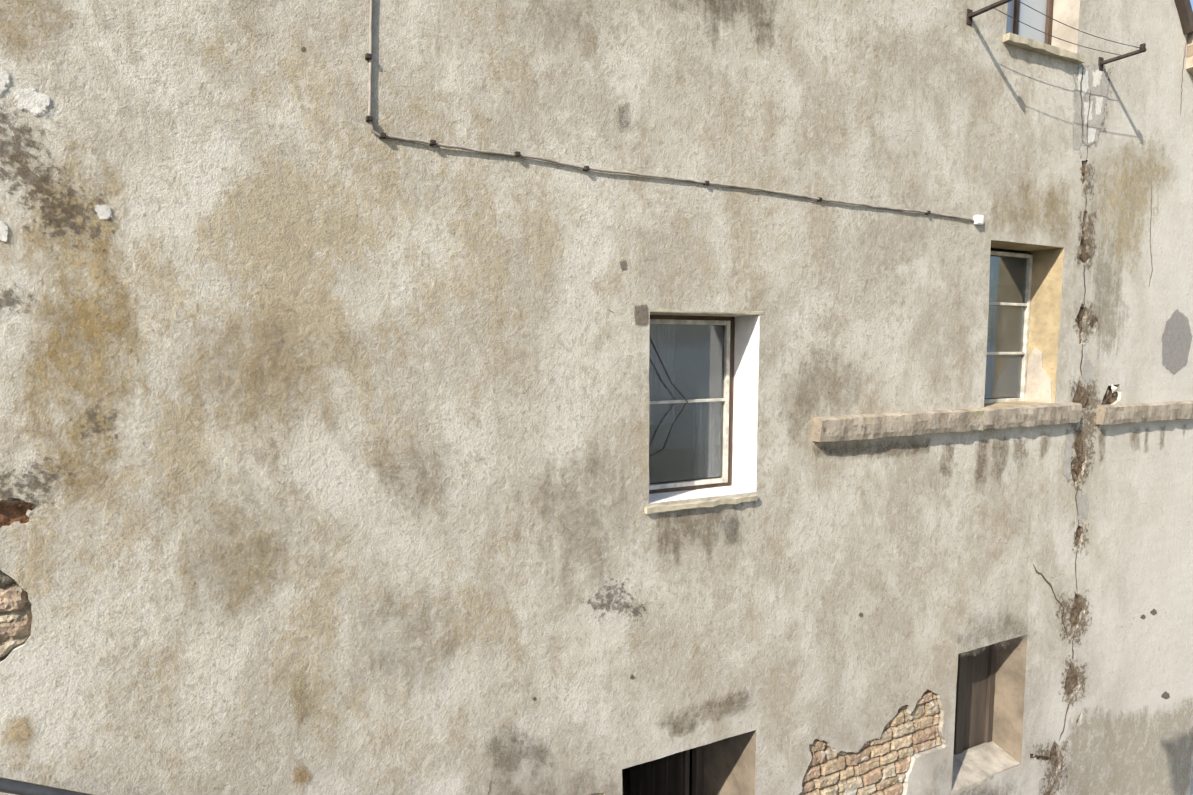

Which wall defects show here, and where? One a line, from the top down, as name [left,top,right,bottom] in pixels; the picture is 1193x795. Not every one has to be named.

leakage [705,0,773,41]
flaking render [0,69,50,115]
crack [1179,39,1187,115]
flaking render [0,220,8,242]
crack [1146,184,1154,288]
leakage [0,107,135,508]
crack [1027,68,1112,795]
flaking render [0,498,36,528]
flaking render [799,689,947,795]